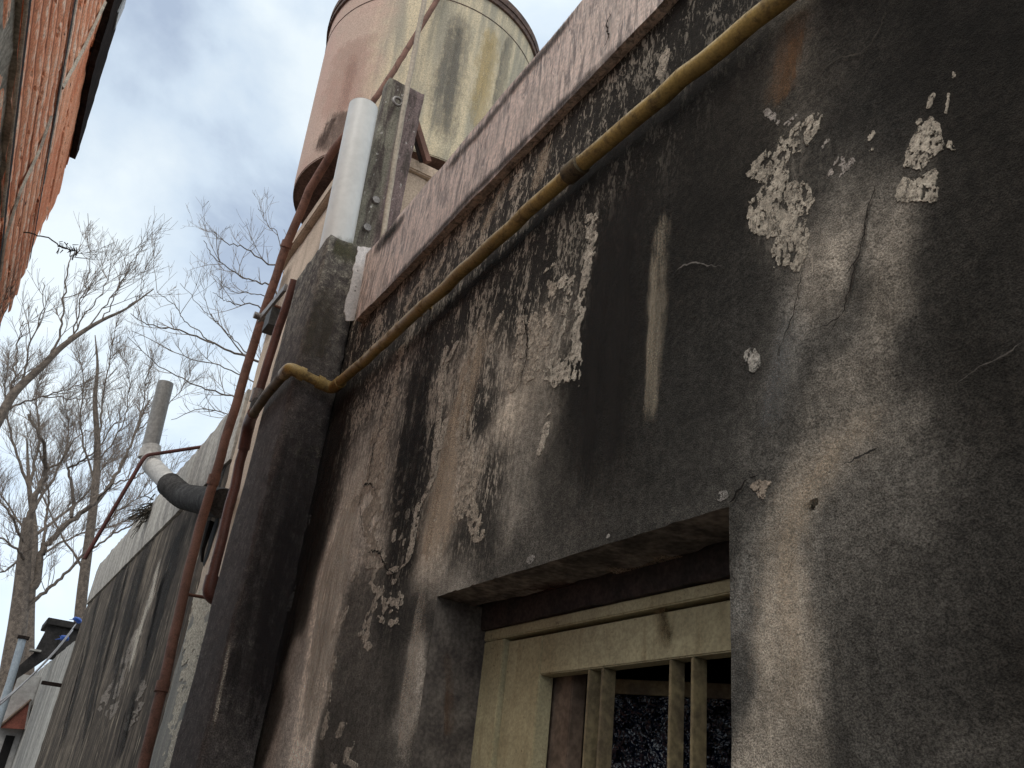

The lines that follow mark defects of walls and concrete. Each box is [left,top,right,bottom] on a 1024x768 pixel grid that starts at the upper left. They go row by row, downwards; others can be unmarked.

leakage [374,215,404,251]
leakage [449,14,572,166]
peeling [504,213,598,393]
leakage [393,41,725,519]
peeling [655,48,671,80]
spalling [744,348,761,373]
peeling [746,108,830,272]
crack [774,182,877,361]
peeling [828,156,856,177]
peeling [895,93,956,204]
peeling [349,310,504,651]
leakage [60,526,185,757]